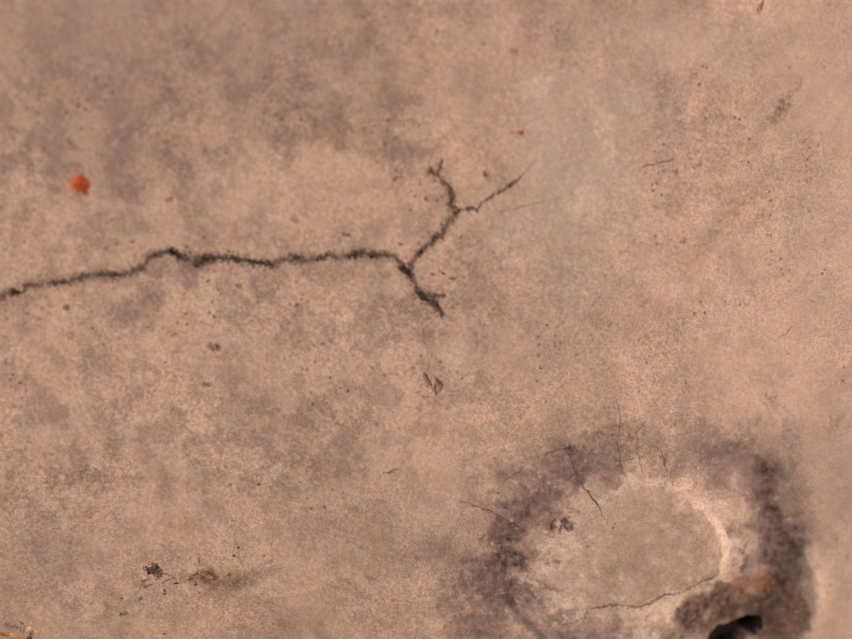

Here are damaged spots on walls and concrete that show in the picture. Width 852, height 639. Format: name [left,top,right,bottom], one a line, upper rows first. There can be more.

corrosion [66,170,94,197]
crack [0,156,568,321]
crack [615,395,668,478]
crack [503,442,608,525]
water stain [417,390,849,639]